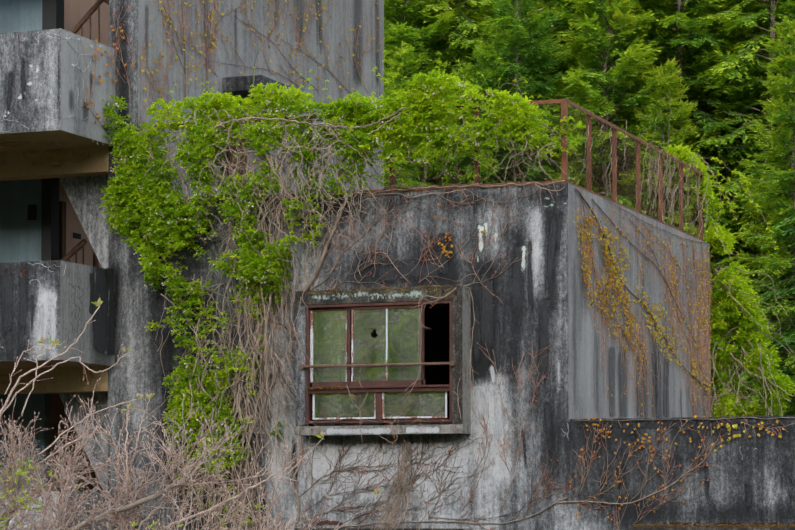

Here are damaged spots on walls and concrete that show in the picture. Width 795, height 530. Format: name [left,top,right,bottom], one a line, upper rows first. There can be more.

leakage [6,58,26,112]
leakage [0,273,56,354]
leakage [89,267,118,355]
leakage [355,233,449,285]
leakage [472,222,501,383]
leakage [510,211,563,387]
leakage [161,338,172,415]
leakage [326,427,392,435]
leakage [576,347,750,493]